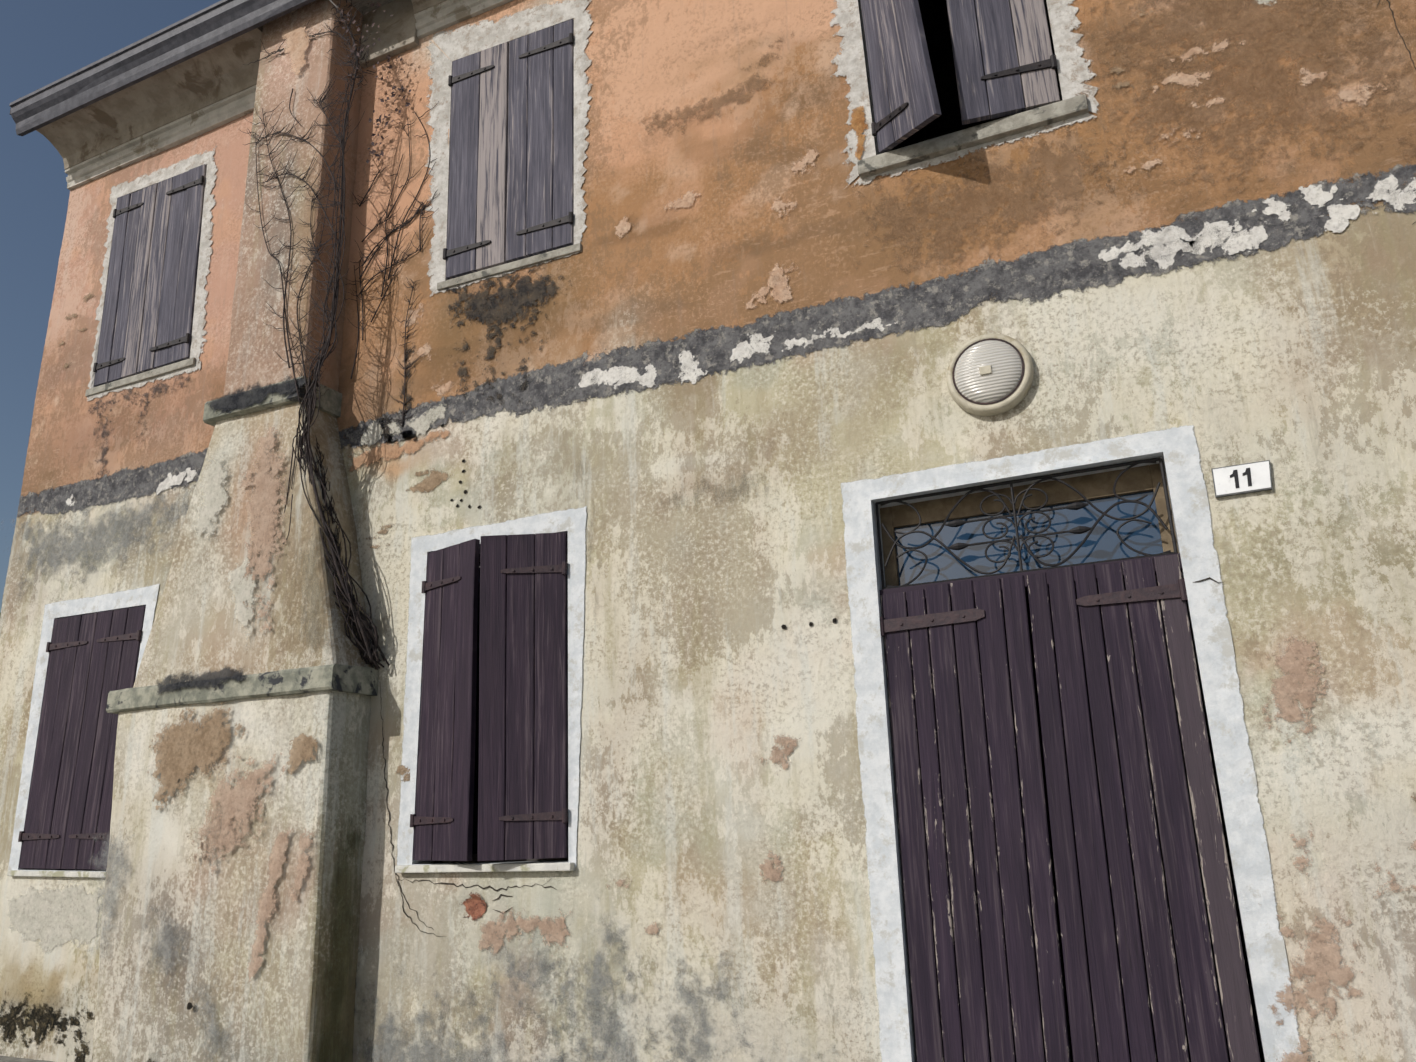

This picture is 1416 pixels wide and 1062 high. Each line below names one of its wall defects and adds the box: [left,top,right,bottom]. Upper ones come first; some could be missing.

crack [1376,0,1416,69]
peeling [1098,173,1416,270]
damp [444,247,572,418]
peeling [578,349,657,389]
peeling [678,350,708,384]
peeling [729,318,902,364]
peeling [349,381,453,472]
peeling [148,703,318,982]
flaking render [462,892,572,956]
damp [363,996,507,1062]
damp [561,930,635,1062]
damp [671,980,727,1062]